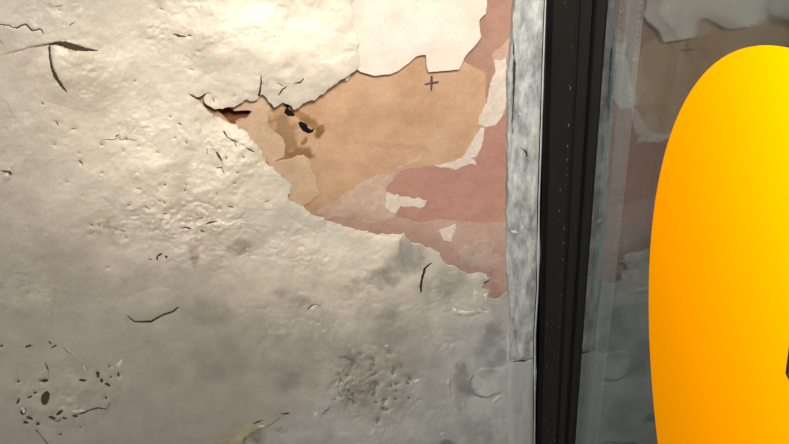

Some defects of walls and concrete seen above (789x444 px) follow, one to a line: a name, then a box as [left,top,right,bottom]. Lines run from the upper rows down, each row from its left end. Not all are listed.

crack [0,22,98,92]
flaking render [197,0,524,316]
crack [419,263,431,292]
crack [127,307,179,323]